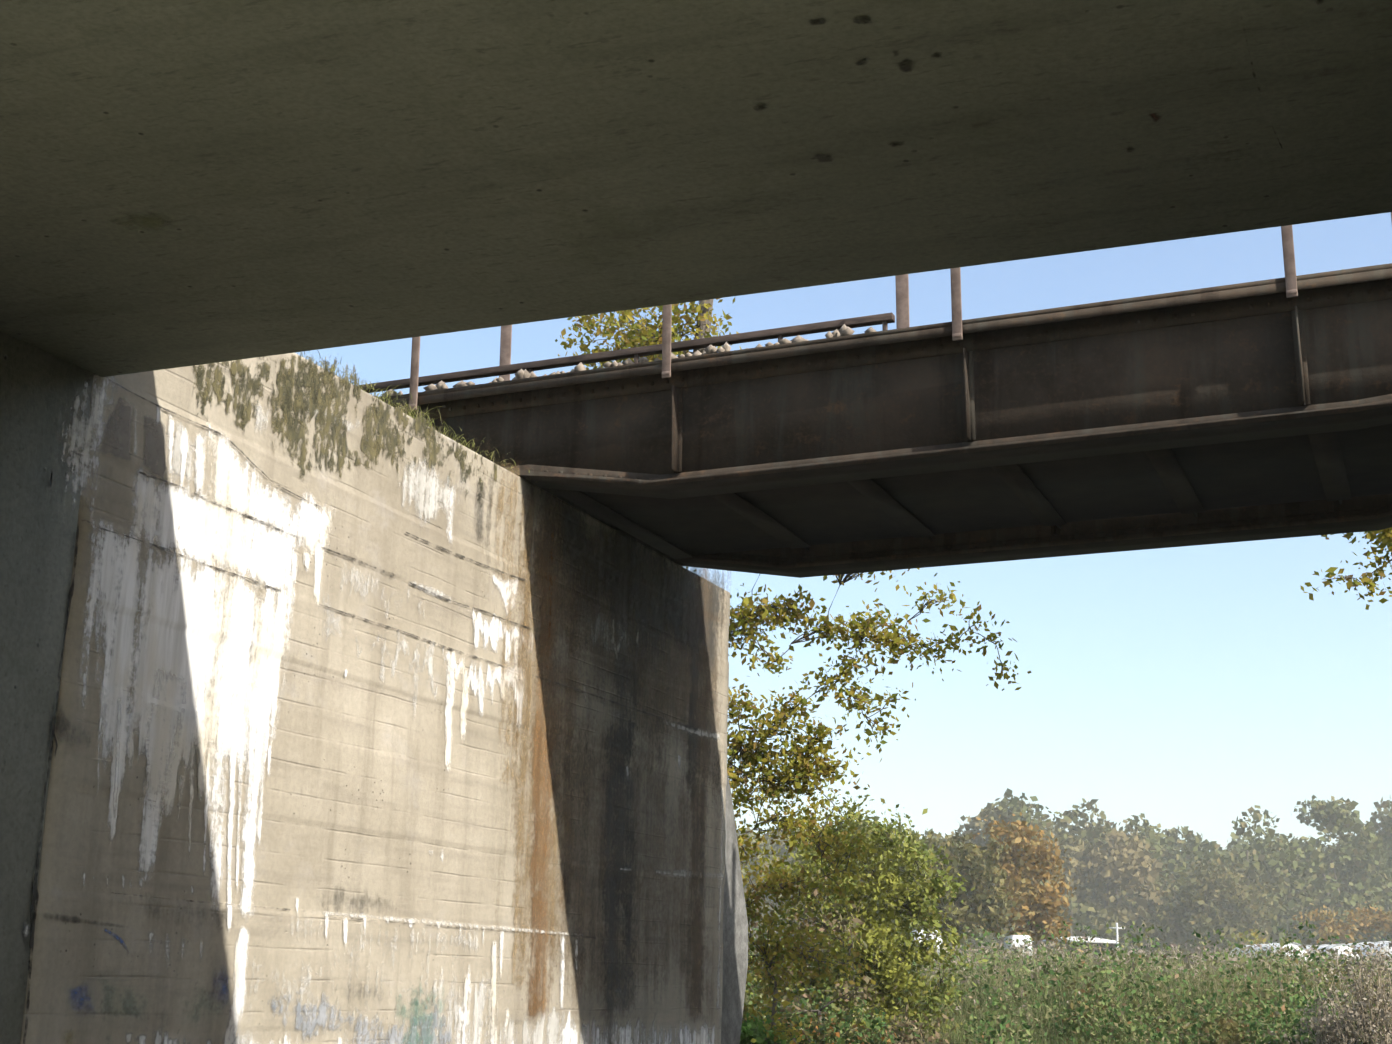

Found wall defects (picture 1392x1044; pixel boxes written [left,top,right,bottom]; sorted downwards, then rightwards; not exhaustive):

damp [62,379,115,500]
damp [195,366,270,425]
damp [83,406,335,1044]
damp [381,502,724,1044]
damp [325,895,366,945]